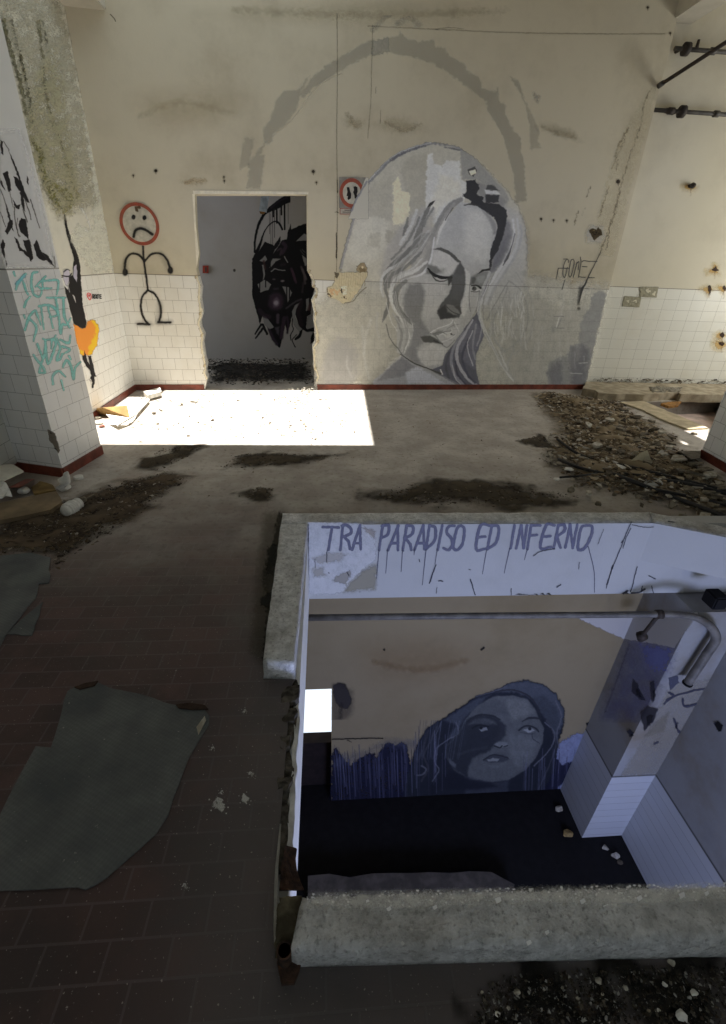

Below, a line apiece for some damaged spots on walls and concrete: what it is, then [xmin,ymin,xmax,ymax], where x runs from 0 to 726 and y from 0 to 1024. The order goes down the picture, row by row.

mould [0,0,96,215]
corrosion [703,265,726,294]
spalling [308,263,368,382]
spalling [47,430,60,453]
peeling [308,522,377,595]